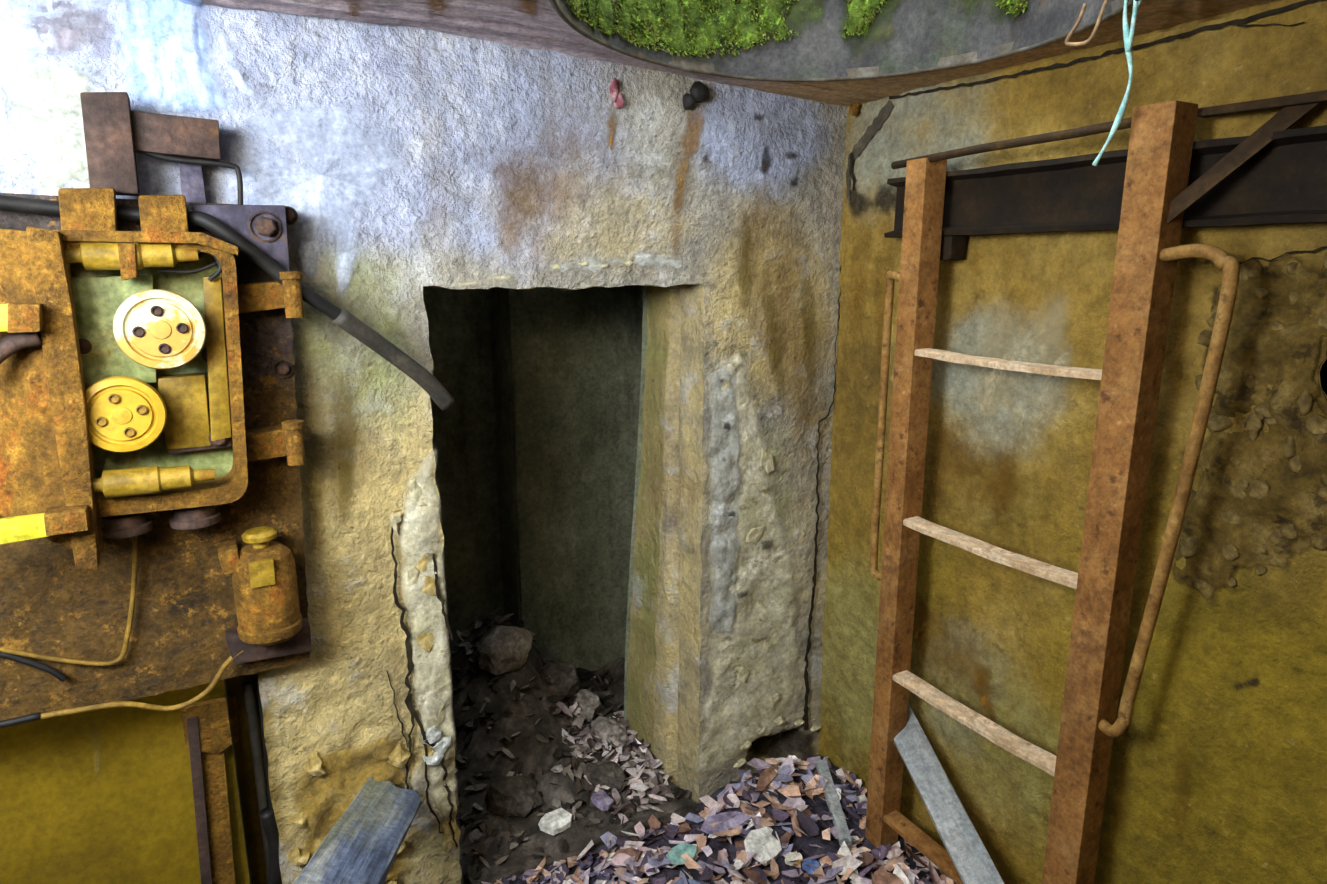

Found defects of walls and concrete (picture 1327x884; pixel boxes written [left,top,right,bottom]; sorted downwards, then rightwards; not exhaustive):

water stain [1,0,90,196]
water stain [123,0,221,110]
water stain [231,69,253,96]
corrosion [678,117,700,192]
crack [1239,246,1327,264]
crack [802,242,843,730]
spalling [1173,253,1327,602]
crack [386,527,458,848]